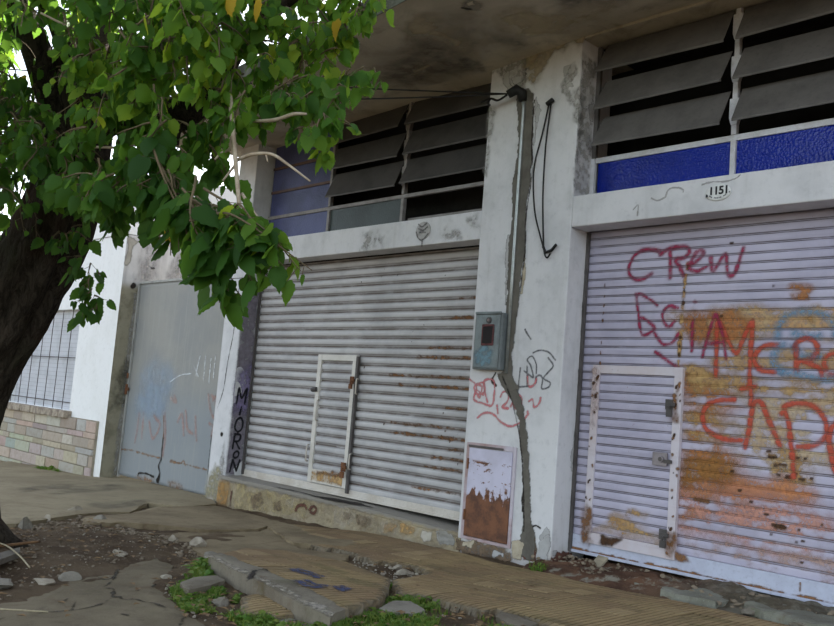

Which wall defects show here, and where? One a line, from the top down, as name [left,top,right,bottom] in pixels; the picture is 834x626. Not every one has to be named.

damp [522,37,585,88]
corrosion [420,346,472,360]
corrosion [389,373,469,390]
corrosion [312,470,343,486]
corrosion [383,421,465,471]
crack [491,372,541,560]
corrosion [572,262,834,594]
crack [40,569,164,615]